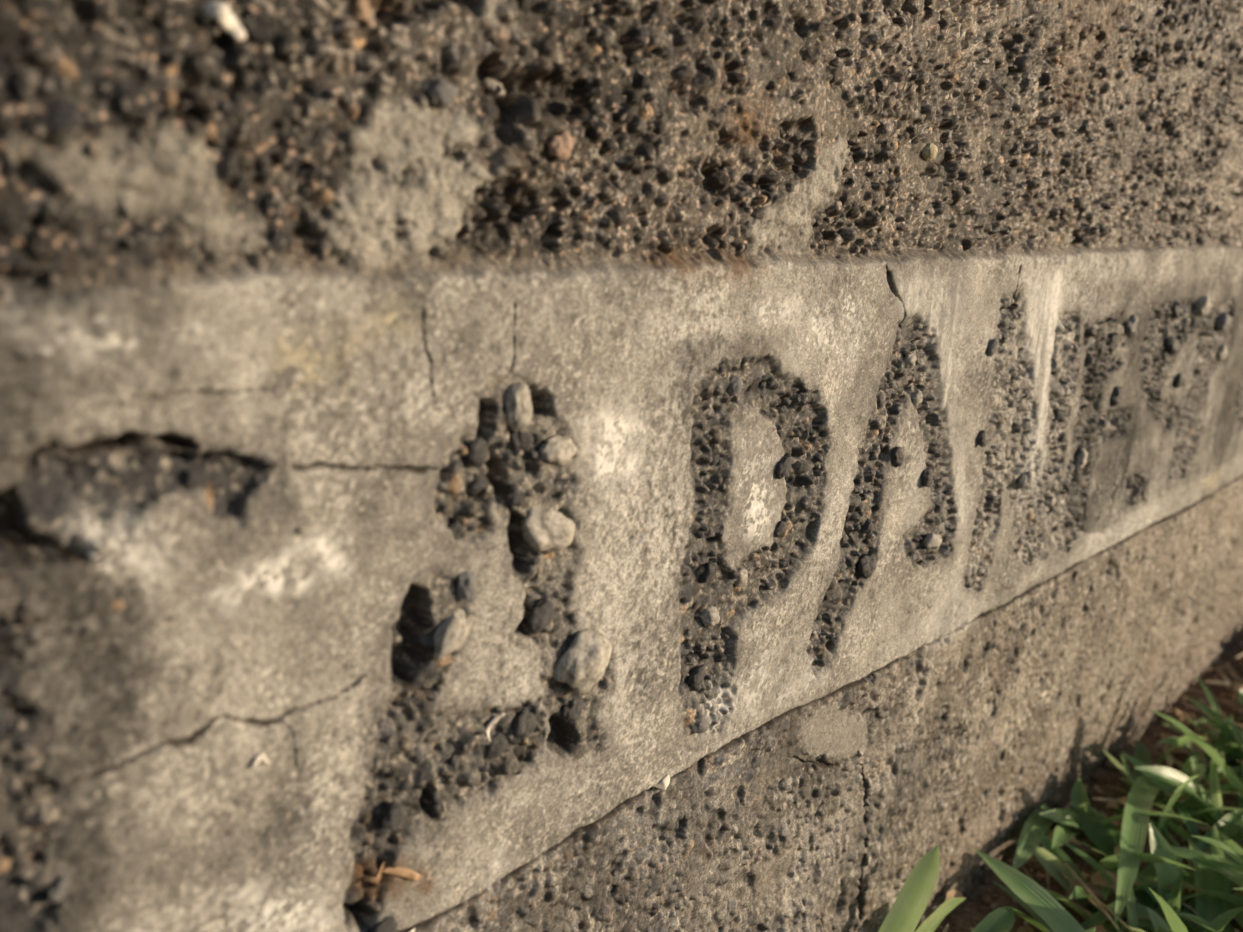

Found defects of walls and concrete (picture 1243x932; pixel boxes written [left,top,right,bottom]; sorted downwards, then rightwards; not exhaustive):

crack [292,462,438,471]
crack [126,712,301,782]
peeling [250,753,270,768]